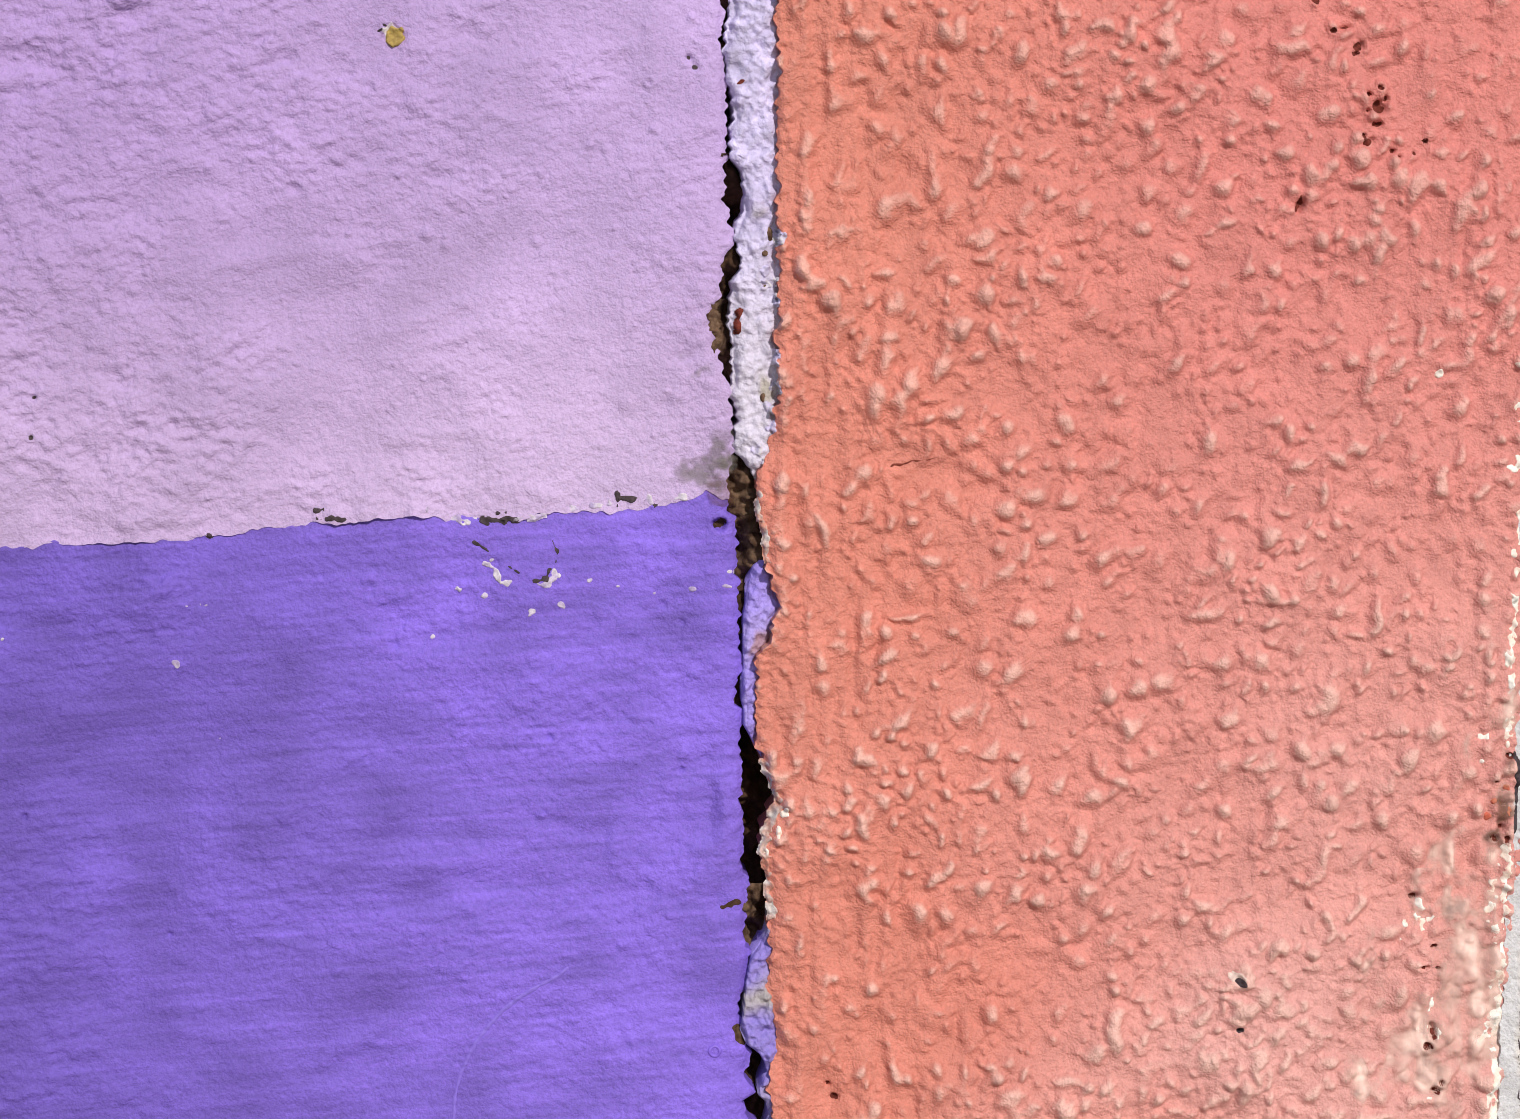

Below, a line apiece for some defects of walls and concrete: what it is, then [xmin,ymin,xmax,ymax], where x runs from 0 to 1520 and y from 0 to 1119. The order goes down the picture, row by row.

crack [718,0,729,48]
spalling [721,0,787,479]
crack [706,87,771,634]
peeling [313,508,347,525]
peeling [451,511,565,609]
peeling [569,490,692,512]
spalling [738,560,780,756]
crack [890,458,934,467]
crack [720,673,789,958]
peeling [1477,510,1520,1119]
crack [732,1023,764,1119]
spalling [738,904,777,1119]